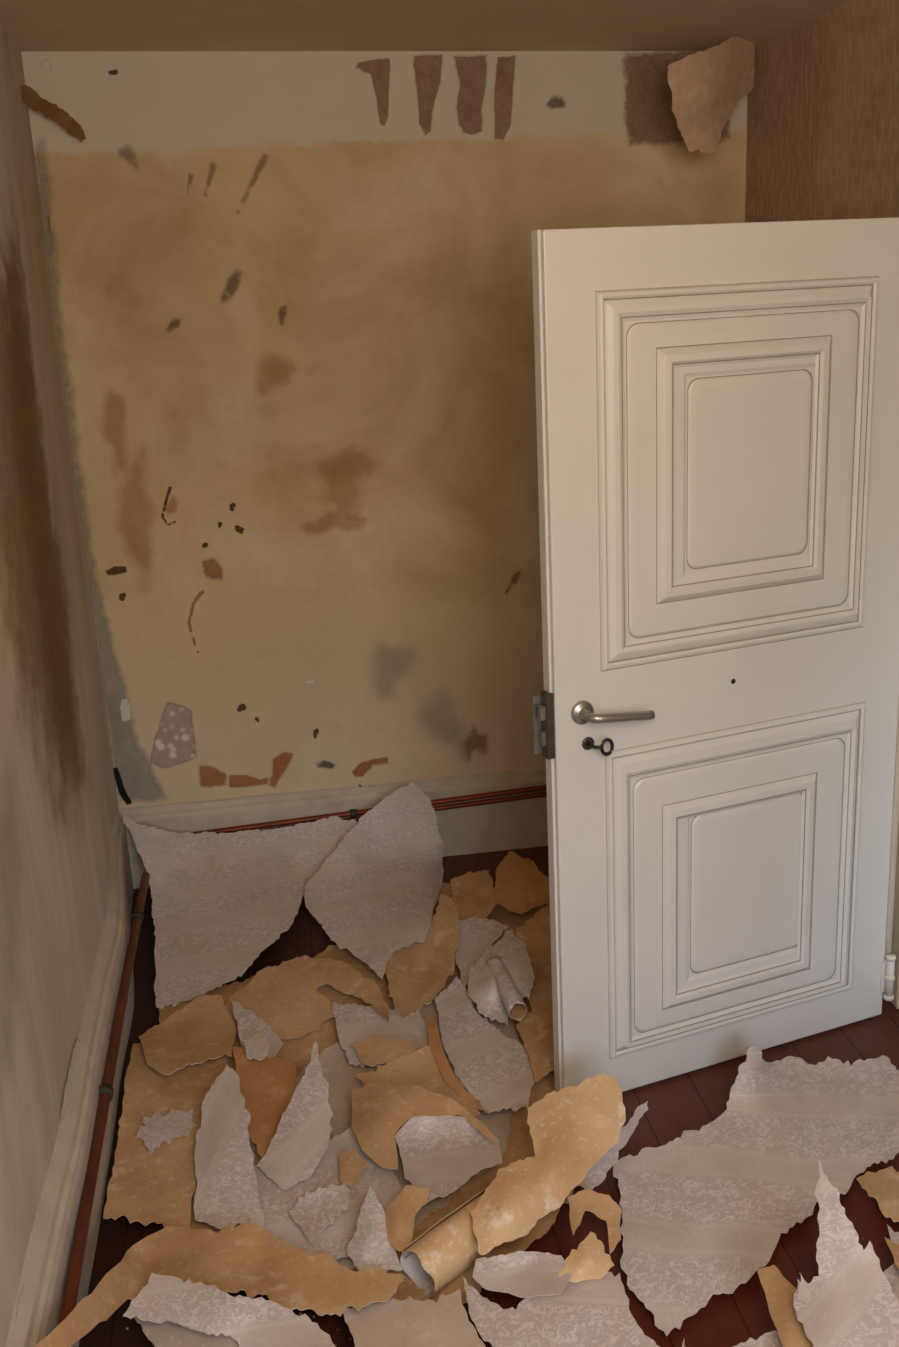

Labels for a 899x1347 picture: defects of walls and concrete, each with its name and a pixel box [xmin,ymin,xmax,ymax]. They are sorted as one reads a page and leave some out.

peeling [357,59,390,125]
peeling [413,55,486,135]